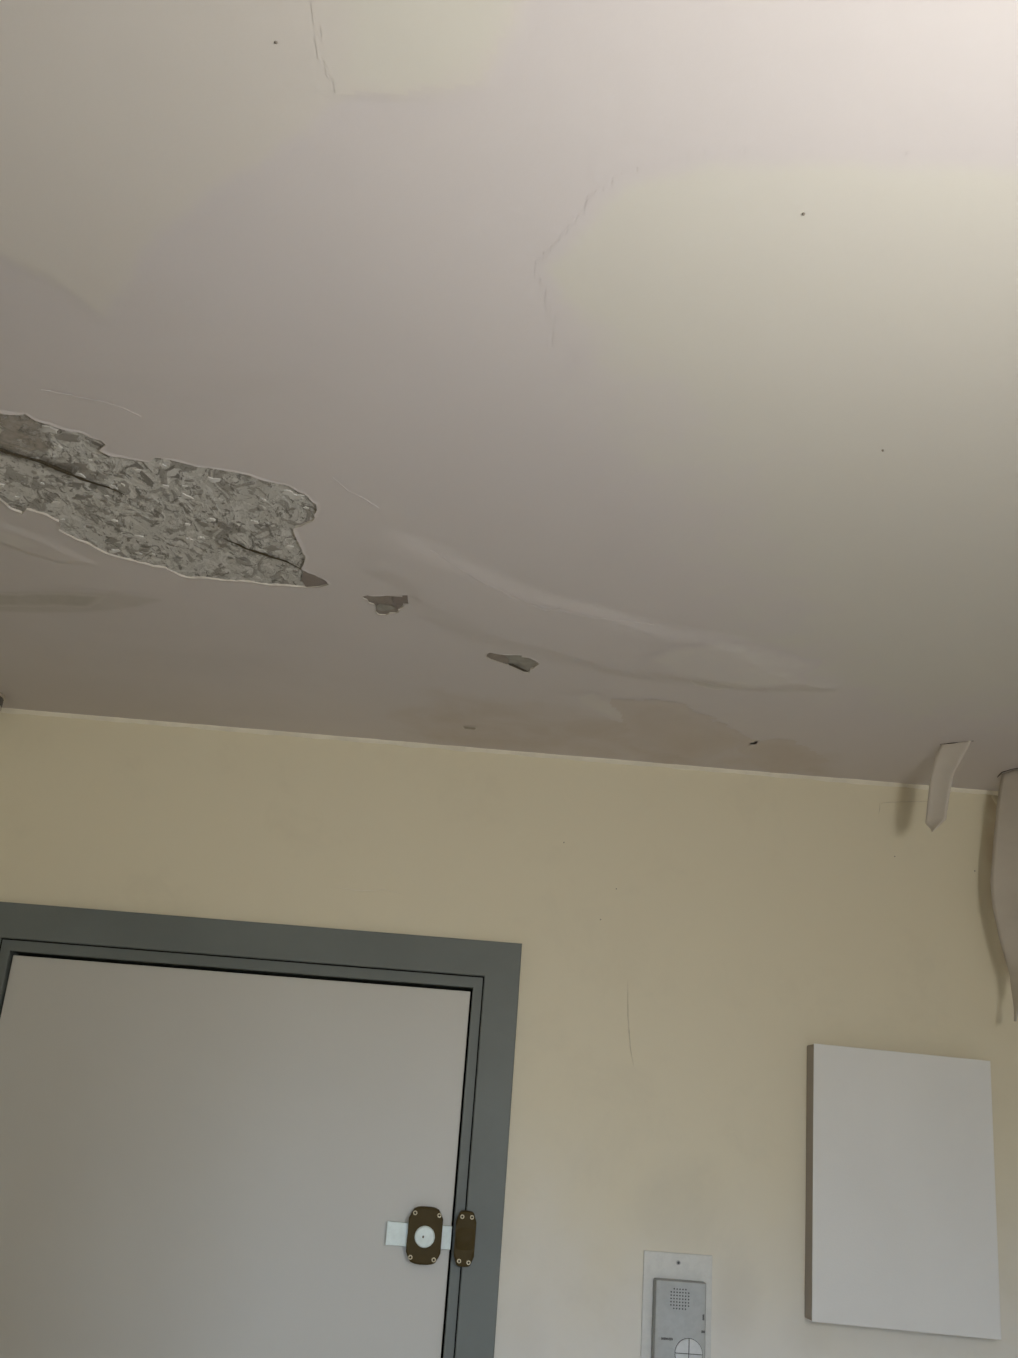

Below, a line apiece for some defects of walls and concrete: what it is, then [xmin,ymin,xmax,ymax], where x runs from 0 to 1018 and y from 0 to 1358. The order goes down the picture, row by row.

peeling [0,410,333,589]
peeling [360,595,413,616]
peeling [485,652,542,673]
peeling [925,741,972,832]
peeling [990,768,1018,1021]